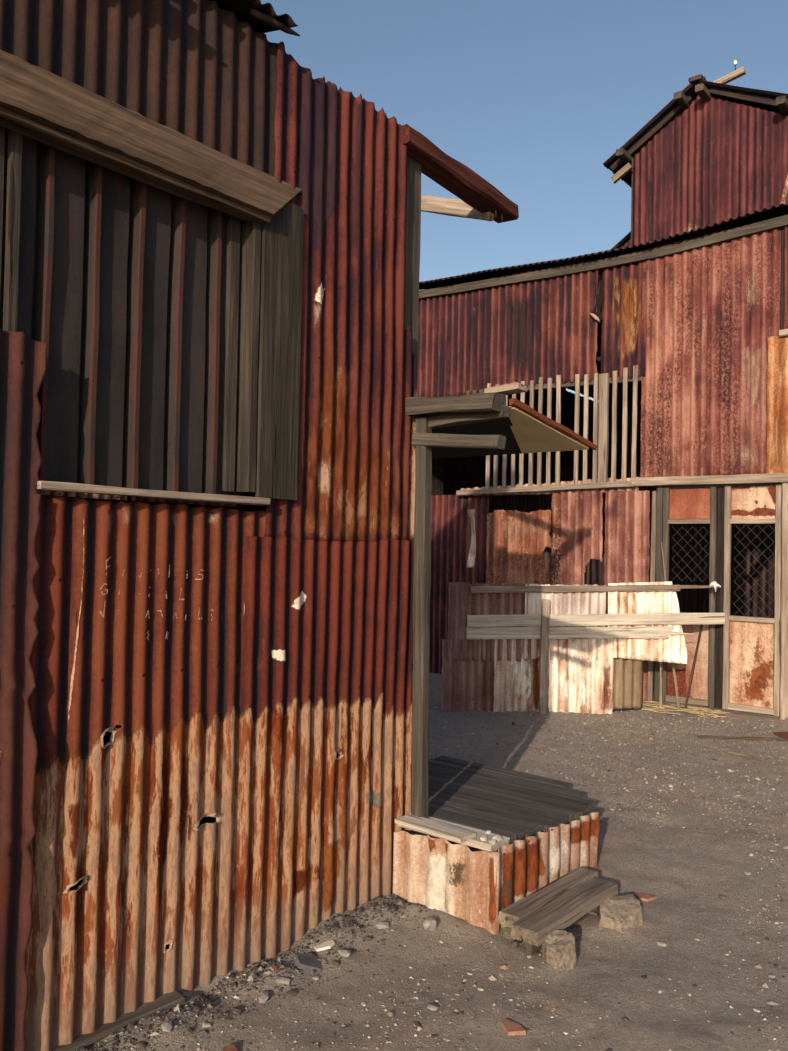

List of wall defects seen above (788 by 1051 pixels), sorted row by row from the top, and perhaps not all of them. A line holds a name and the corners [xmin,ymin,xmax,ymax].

rust [613,278,640,357]
rust [299,366,417,539]
spalling [291,591,306,610]
spalling [272,649,286,661]
rust [603,666,612,709]
rust [745,639,774,707]
rust [24,693,412,1051]
rust [429,839,465,887]
rust [489,838,545,923]
rust [570,817,600,843]